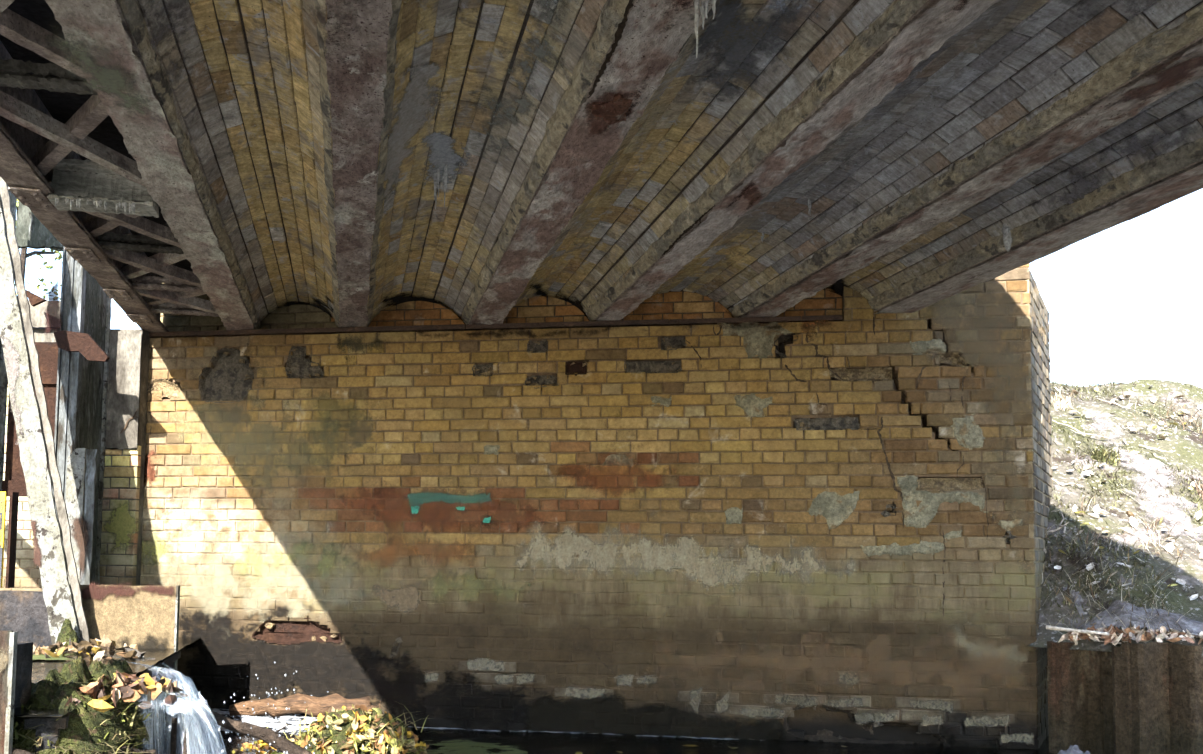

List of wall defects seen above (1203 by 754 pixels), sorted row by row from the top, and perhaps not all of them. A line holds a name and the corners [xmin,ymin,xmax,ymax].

corrosion [586,76,649,135]
spalling [198,348,254,403]
spalling [285,346,324,379]
crack [785,337,850,411]
crack [864,319,989,537]
corrosion [558,459,676,495]
corrosion [340,487,542,533]
efflorescence [516,521,854,590]
damp [117,635,167,649]
damp [144,552,1034,750]